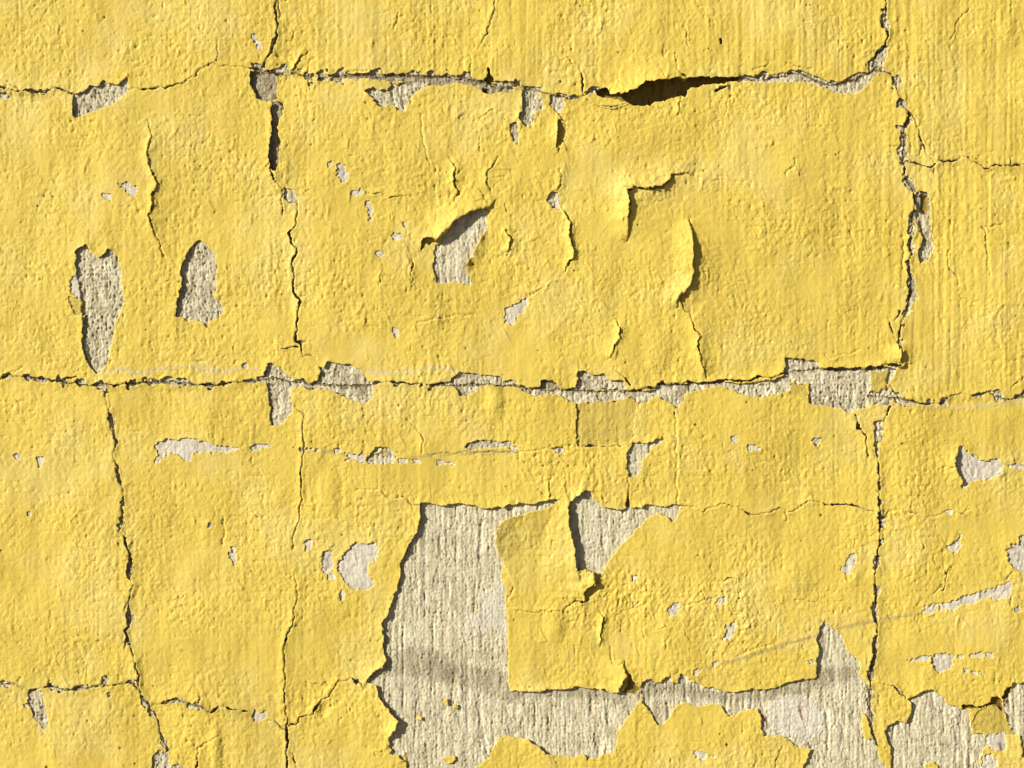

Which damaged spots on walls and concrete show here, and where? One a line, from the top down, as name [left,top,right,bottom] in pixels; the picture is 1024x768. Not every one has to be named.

peeling [68,244,125,374]
peeling [176,240,224,328]
peeling [391,187,495,285]
crack [0,0,1024,448]
crack [293,410,306,549]
peeling [264,361,373,426]
peeling [540,357,897,478]
crack [0,463,255,752]
crack [270,582,364,768]
crack [508,596,585,613]
peeling [365,488,1024,768]
crack [674,414,906,747]